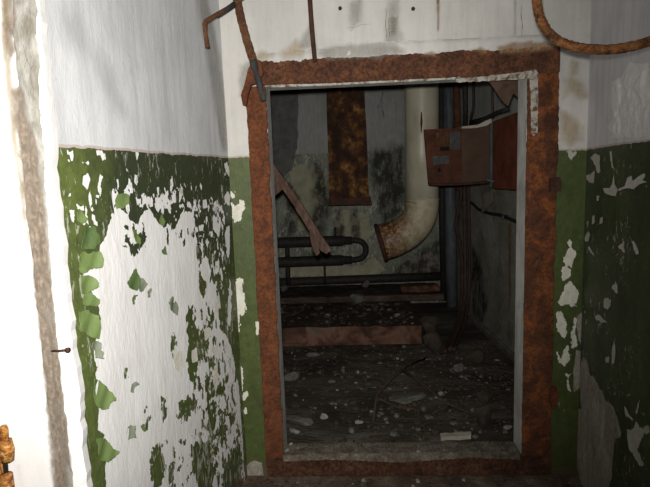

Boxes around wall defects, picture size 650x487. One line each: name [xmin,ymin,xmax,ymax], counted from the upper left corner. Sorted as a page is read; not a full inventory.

spalling [12,0,58,353]
damp [312,167,329,231]
damp [373,146,405,222]
peeling [586,153,600,183]
peeling [585,216,603,256]
peeling [597,151,646,201]
peeling [69,162,264,487]
peeling [556,239,650,487]
spalling [46,385,73,487]